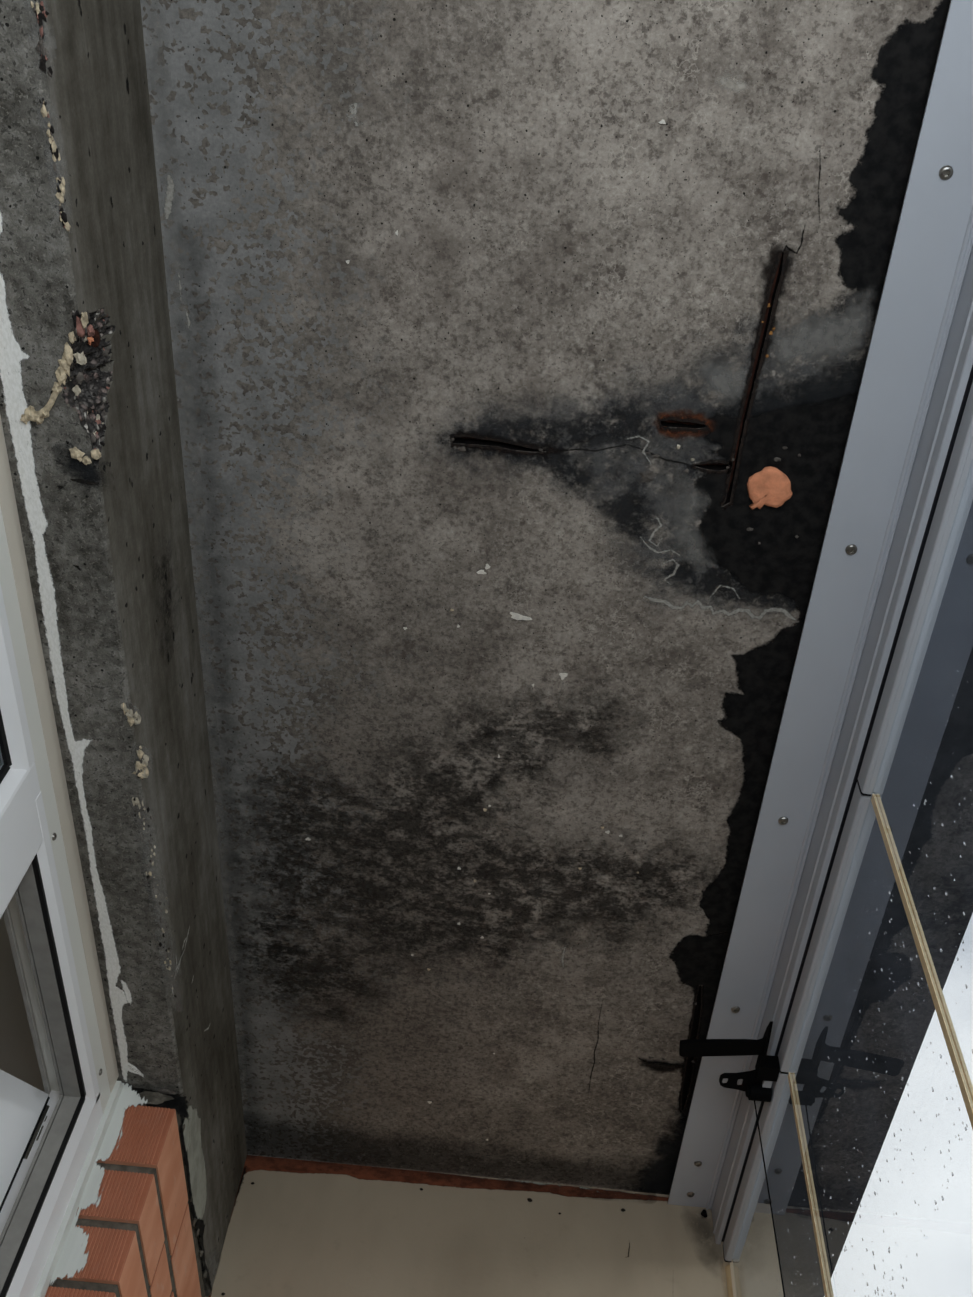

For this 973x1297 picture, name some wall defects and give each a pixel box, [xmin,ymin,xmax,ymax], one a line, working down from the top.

damp [164,175,174,219]
damp [229,0,951,1039]
damp [626,1057,702,1195]